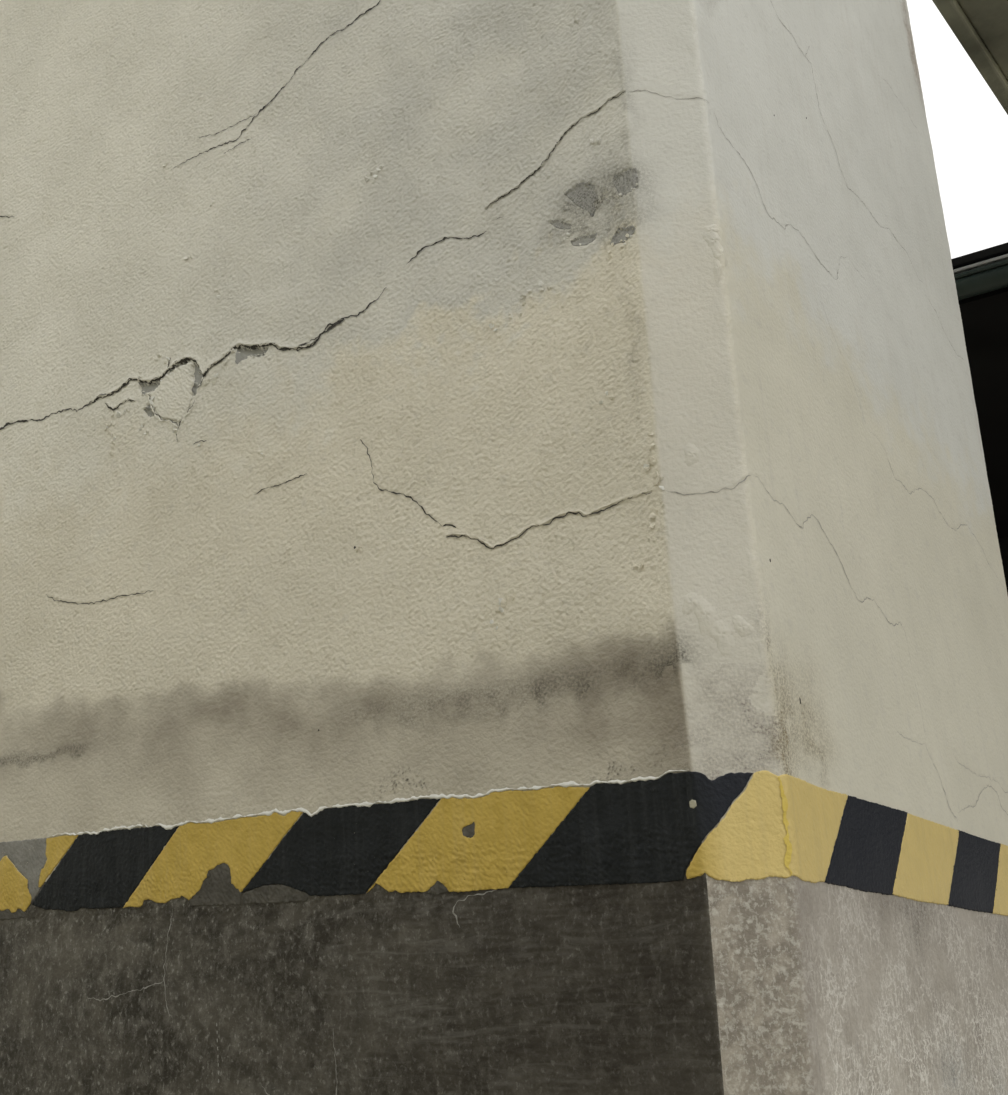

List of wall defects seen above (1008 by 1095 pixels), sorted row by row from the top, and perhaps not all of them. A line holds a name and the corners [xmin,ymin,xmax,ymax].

crack [171,1,380,170]
crack [408,90,866,281]
flaking render [138,362,203,422]
crack [0,287,387,456]
crack [360,439,910,655]
peeling [0,770,689,921]